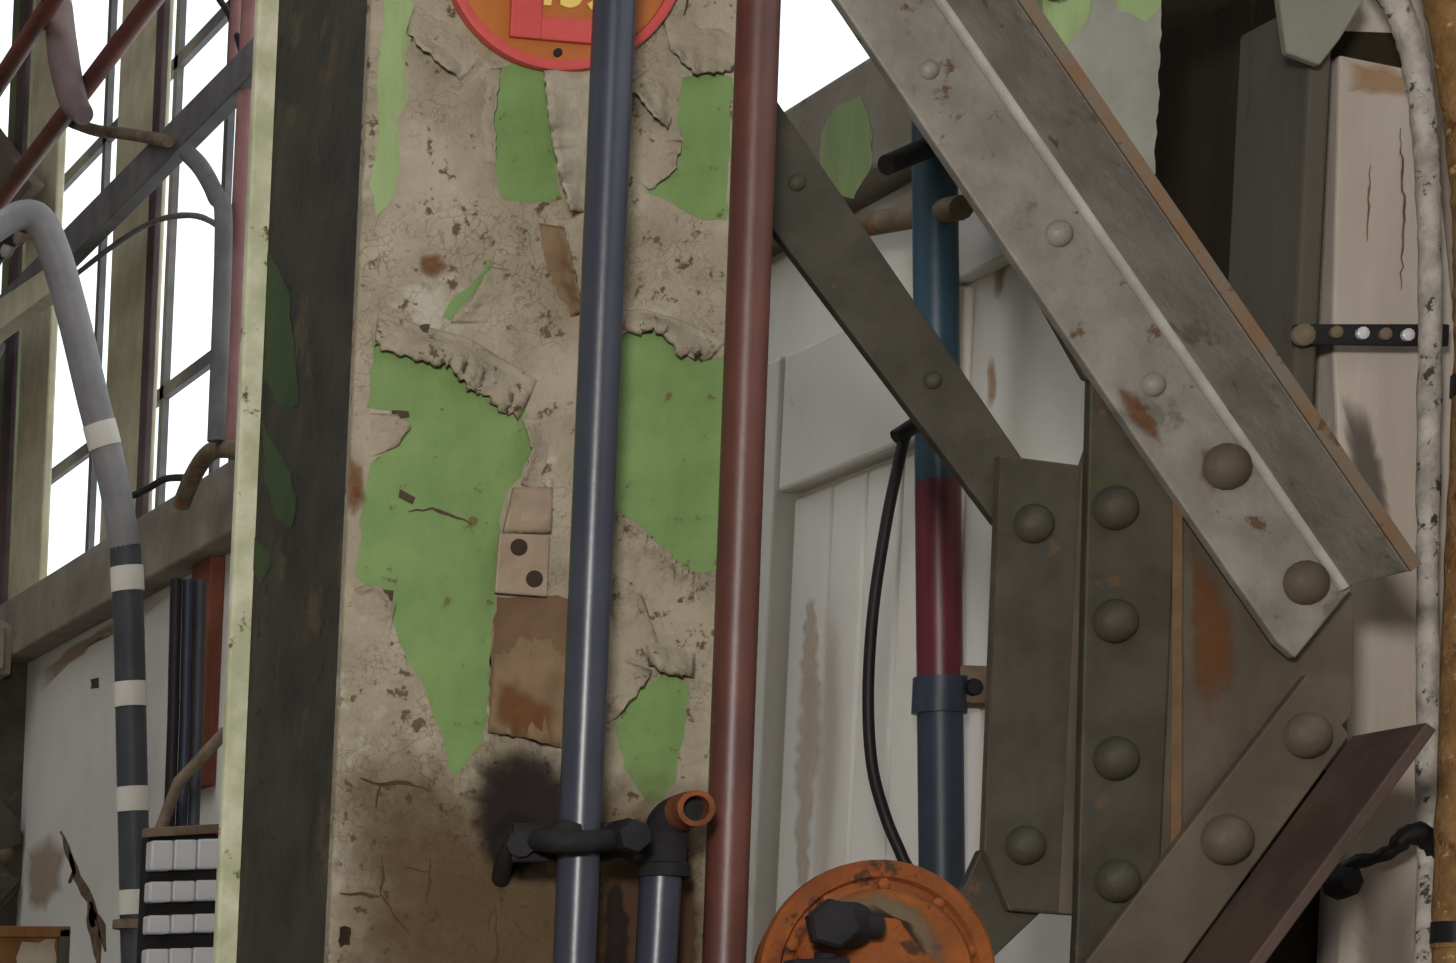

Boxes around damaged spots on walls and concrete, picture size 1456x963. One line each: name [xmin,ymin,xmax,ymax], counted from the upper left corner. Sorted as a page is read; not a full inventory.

peeling [369,0,590,215]
peeling [632,14,735,220]
peeling [539,223,580,317]
crack [1367,128,1406,290]
peeling [351,259,568,776]
peeling [606,309,724,801]
peeling [16,939,56,963]
crack [340,877,385,898]
crack [359,777,427,806]
leakage [358,781,557,963]
leakage [596,862,630,963]